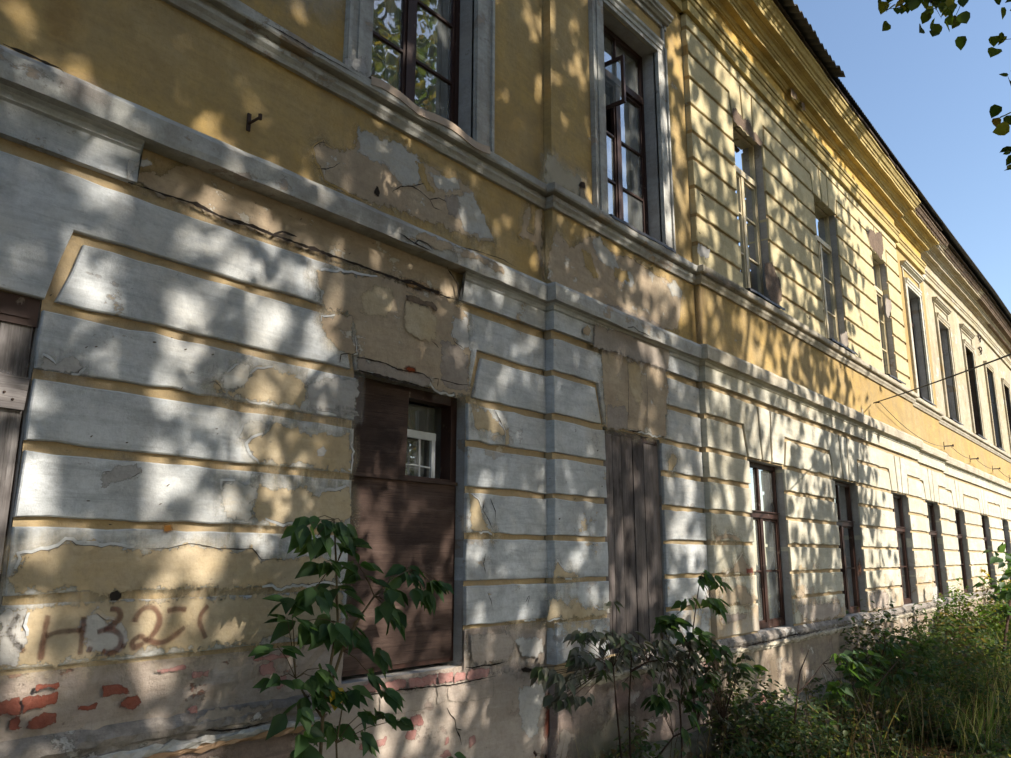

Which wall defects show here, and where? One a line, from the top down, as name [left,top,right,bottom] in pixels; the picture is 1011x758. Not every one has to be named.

crack [128,182,467,303]
flaking render [137,165,509,445]
peeling [312,126,496,246]
flaking render [517,203,682,331]
flaking render [582,324,670,438]
peeling [220,479,352,530]
peeling [238,420,355,472]
peeling [0,537,344,689]
flaking render [0,682,60,730]
flaking render [77,684,141,711]
flaking render [310,598,607,758]